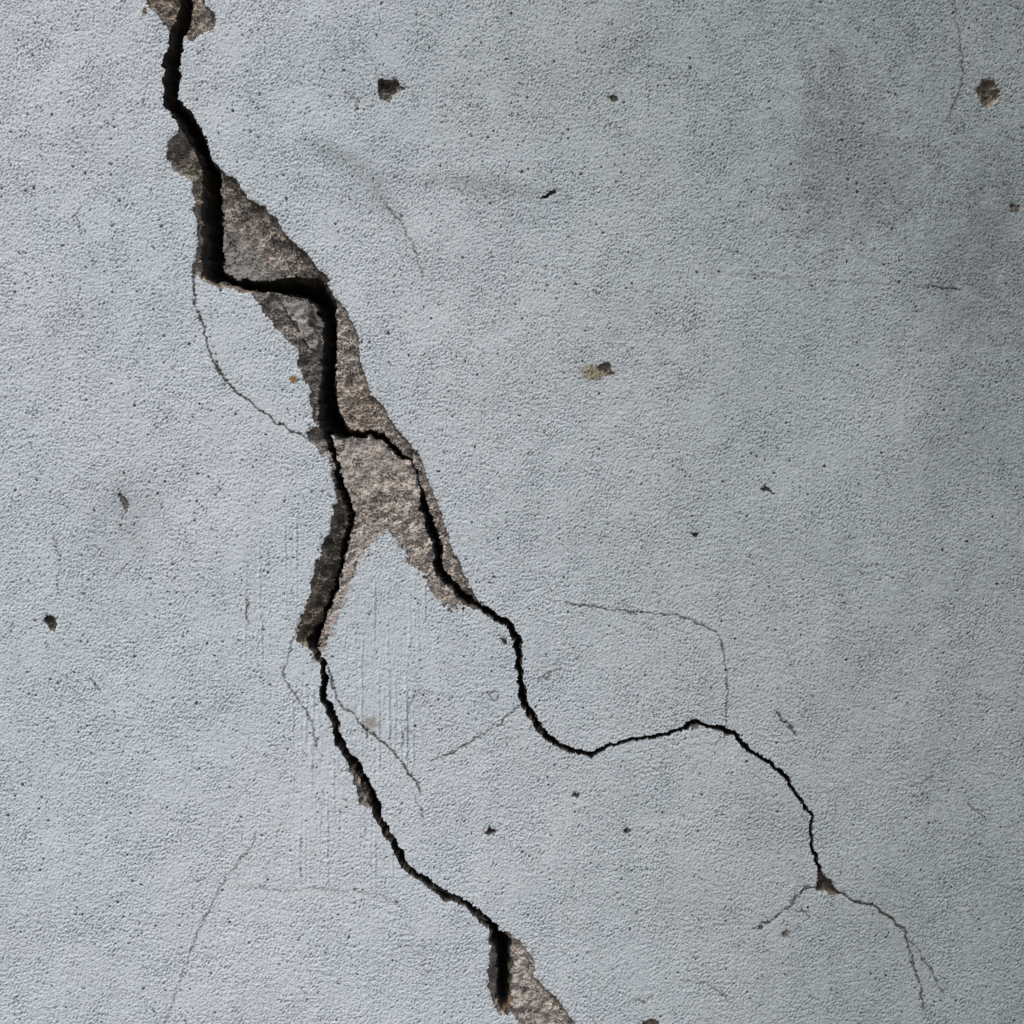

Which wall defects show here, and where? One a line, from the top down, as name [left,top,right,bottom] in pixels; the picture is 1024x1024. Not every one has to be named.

spalling [146,0,216,41]
spalling [166,121,485,660]
crack [161,0,937,1015]
spalling [486,929,575,1024]